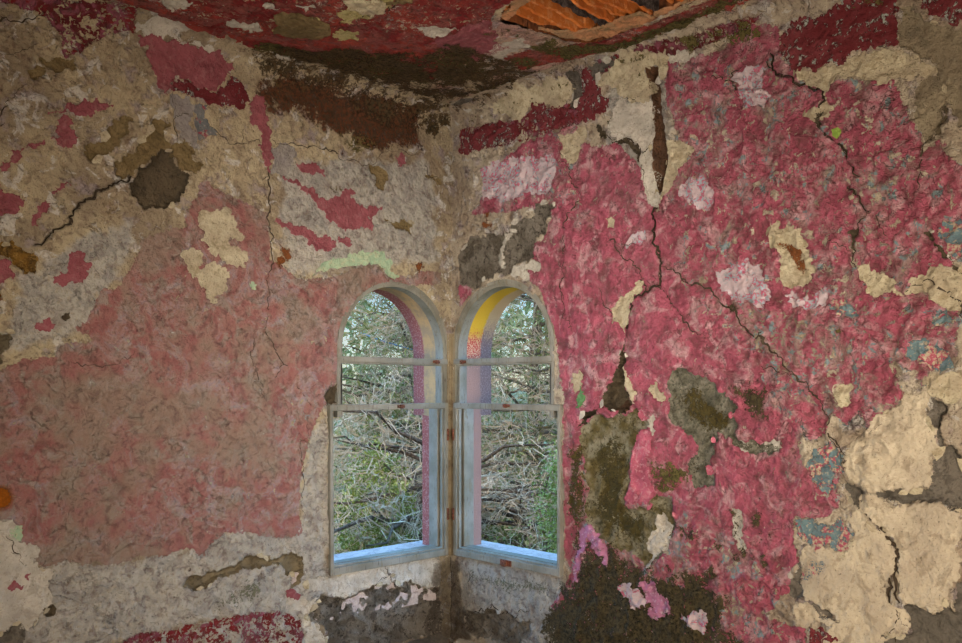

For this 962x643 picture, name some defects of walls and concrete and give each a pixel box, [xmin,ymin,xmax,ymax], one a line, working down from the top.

crack [35,176,132,245]
peeling [0,0,415,287]
flaking render [183,552,444,643]
water stain [256,71,424,157]
flaking render [417,10,714,290]
water stain [425,437,744,643]
water stain [675,387,729,439]
crack [600,134,881,471]
mould [728,379,774,422]
crack [708,53,888,268]
peeling [789,338,962,643]
crack [858,508,907,642]